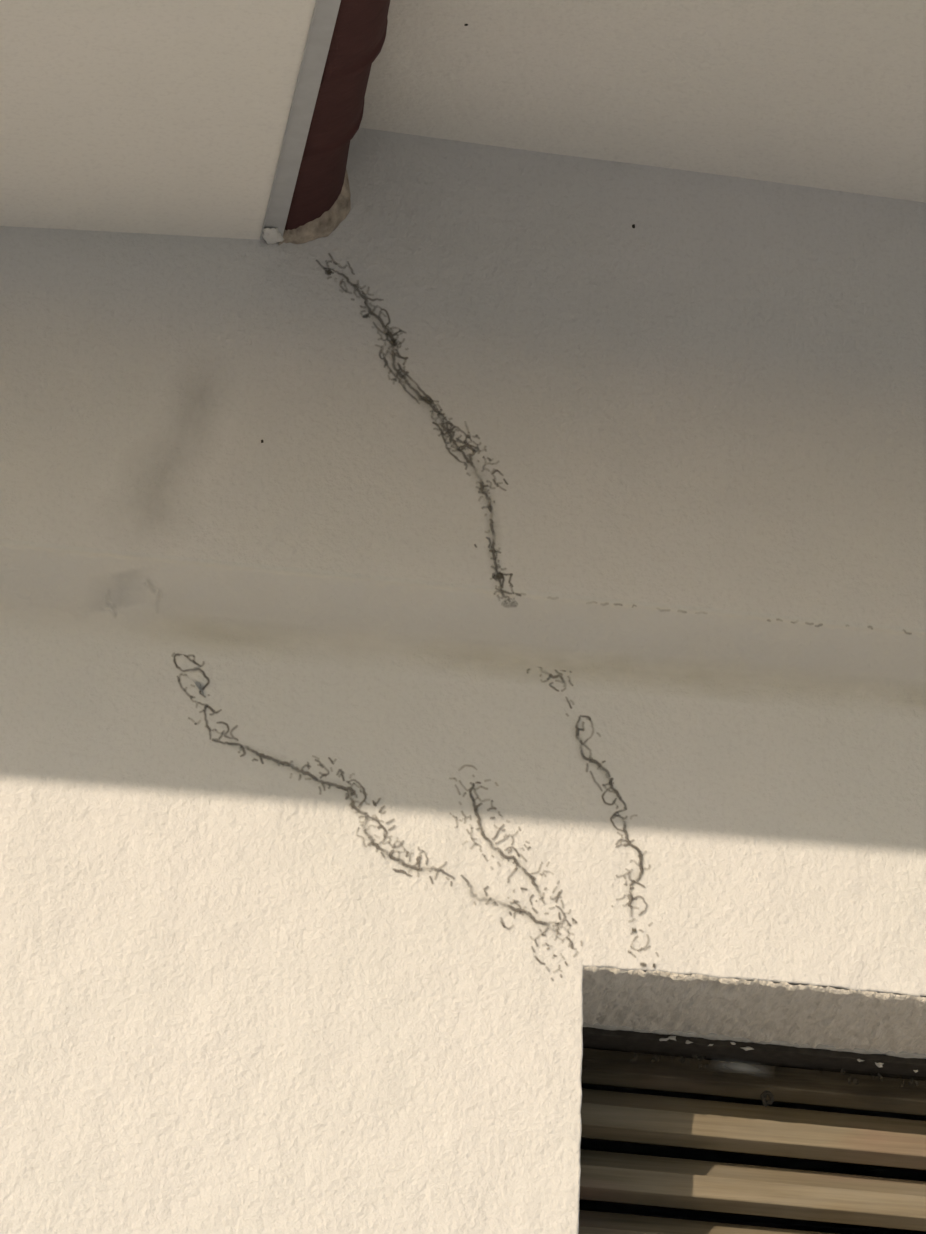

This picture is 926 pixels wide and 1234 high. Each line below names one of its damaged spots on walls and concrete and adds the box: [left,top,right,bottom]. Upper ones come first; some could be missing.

crack [317,253,521,606]
crack [174,654,577,980]
crack [548,670,647,932]